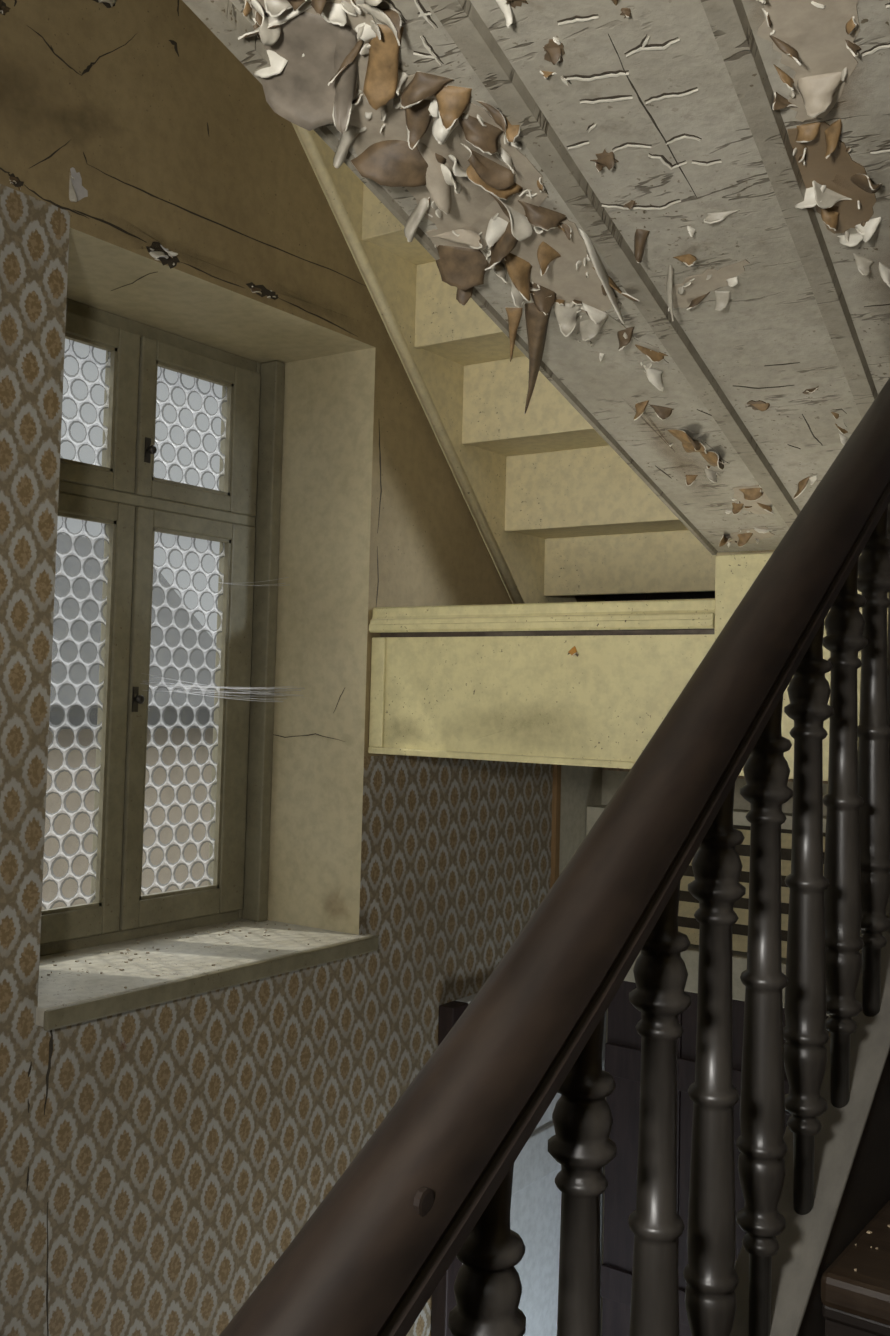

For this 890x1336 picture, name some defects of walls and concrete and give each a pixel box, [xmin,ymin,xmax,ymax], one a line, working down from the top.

crack [14,0,136,76]
crack [169,0,179,57]
crack [861,43,890,57]
crack [557,14,722,210]
peeling [756,0,890,288]
crack [870,147,890,155]
peeling [238,0,729,486]
peeling [687,210,740,237]
peeling [666,254,750,321]
peeling [747,400,770,411]
peeling [719,485,775,548]